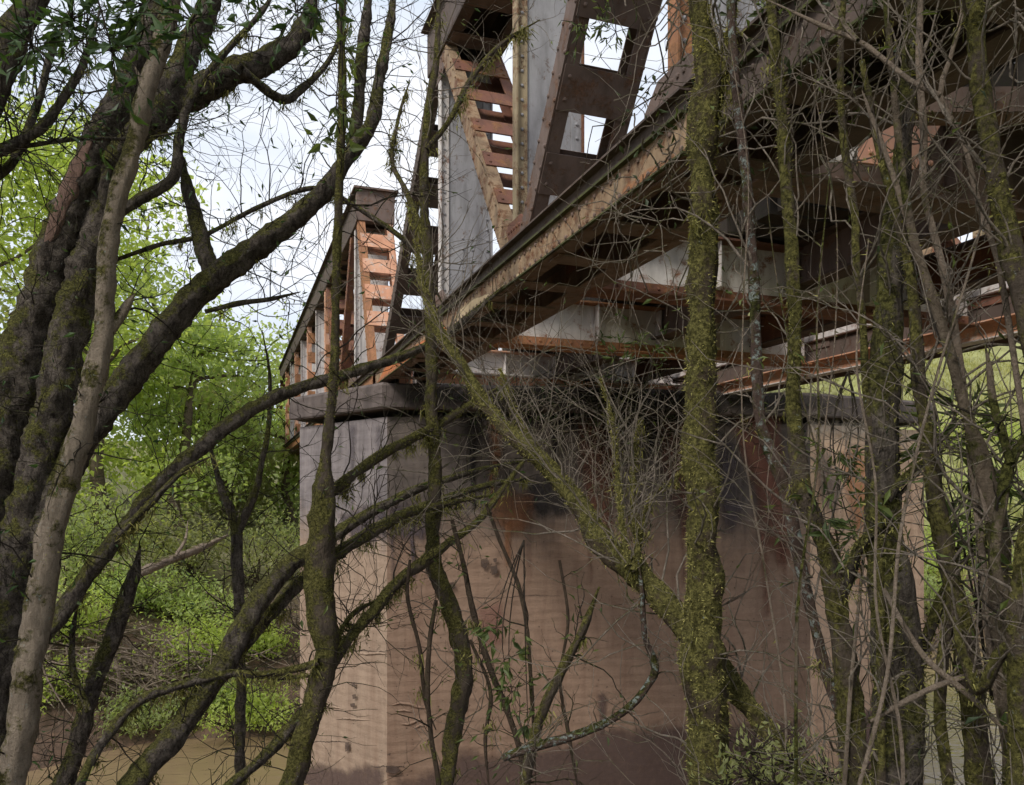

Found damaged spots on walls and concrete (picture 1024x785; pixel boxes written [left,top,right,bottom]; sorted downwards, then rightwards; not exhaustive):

corrosion [738,416,791,567]